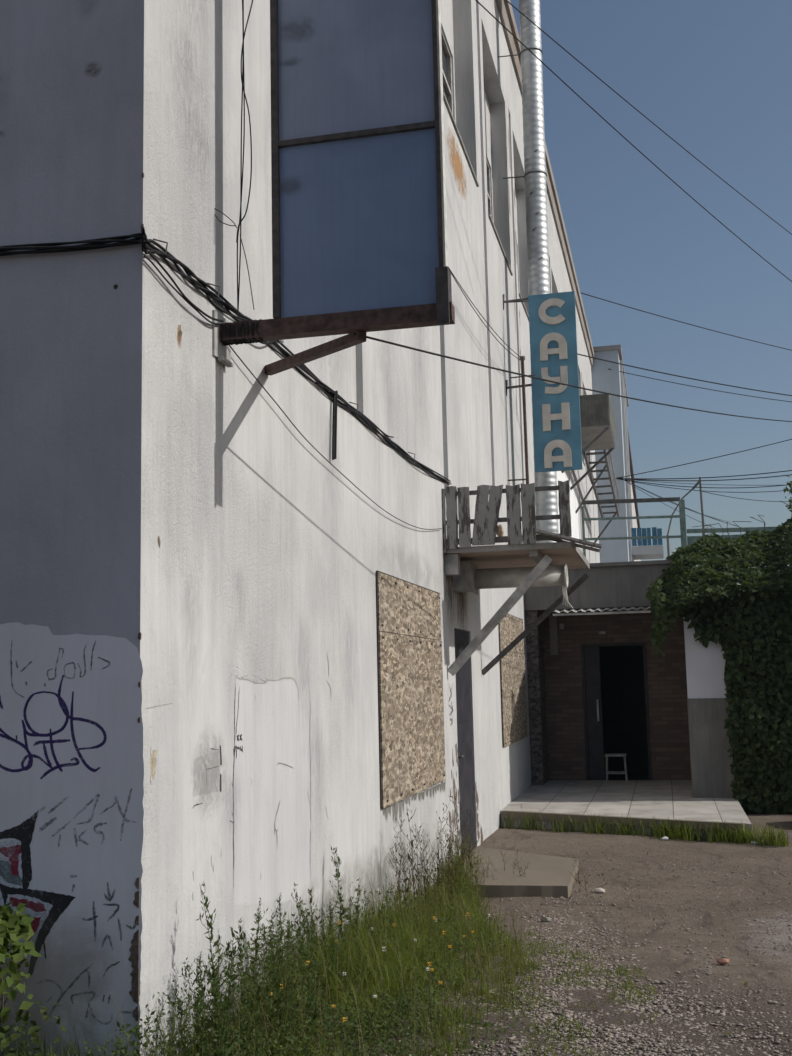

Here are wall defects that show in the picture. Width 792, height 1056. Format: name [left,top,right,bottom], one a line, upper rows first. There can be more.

spalling [128,878,141,1037]